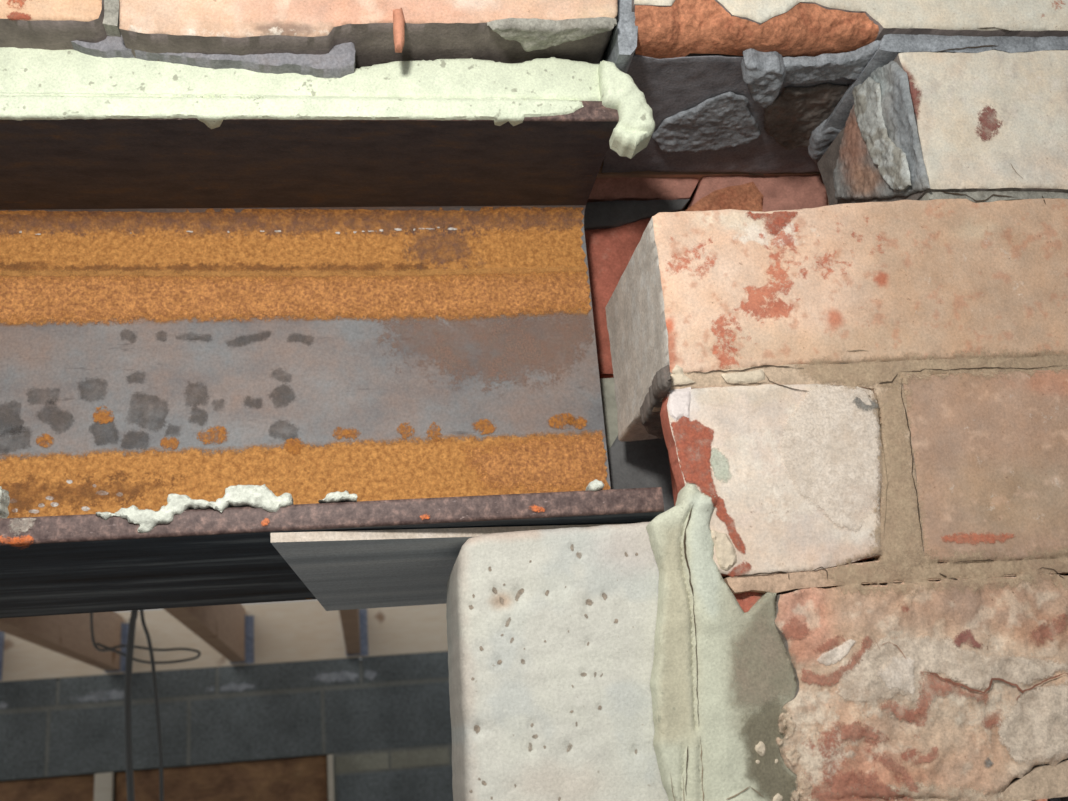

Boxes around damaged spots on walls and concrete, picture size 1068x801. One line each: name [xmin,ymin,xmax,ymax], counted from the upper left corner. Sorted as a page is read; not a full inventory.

spalling [635,0,879,59]
rust [0,206,591,325]
rust [93,407,114,424]
rust [0,413,610,518]
flaking render [1031,613,1068,646]
damp [734,606,811,801]
peeling [801,629,1068,763]
crack [875,640,1067,701]
flaking render [811,722,938,801]